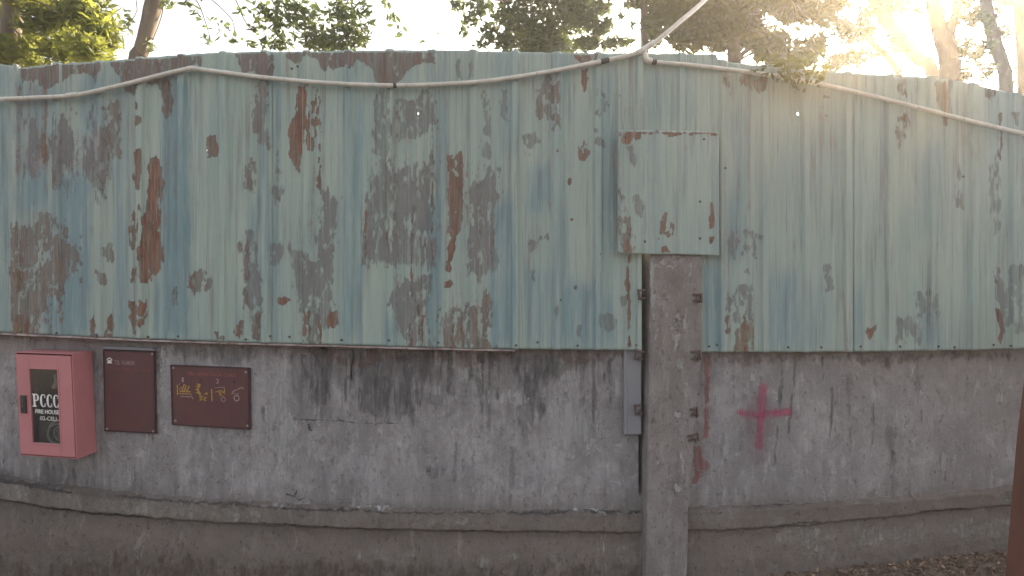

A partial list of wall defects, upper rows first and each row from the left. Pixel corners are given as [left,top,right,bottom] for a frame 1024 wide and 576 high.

rust [21,55,201,126]
rust [288,86,322,190]
peeling [9,212,82,345]
rust [128,149,164,283]
peeling [273,187,337,342]
peeling [361,155,501,351]
rust [444,151,464,288]